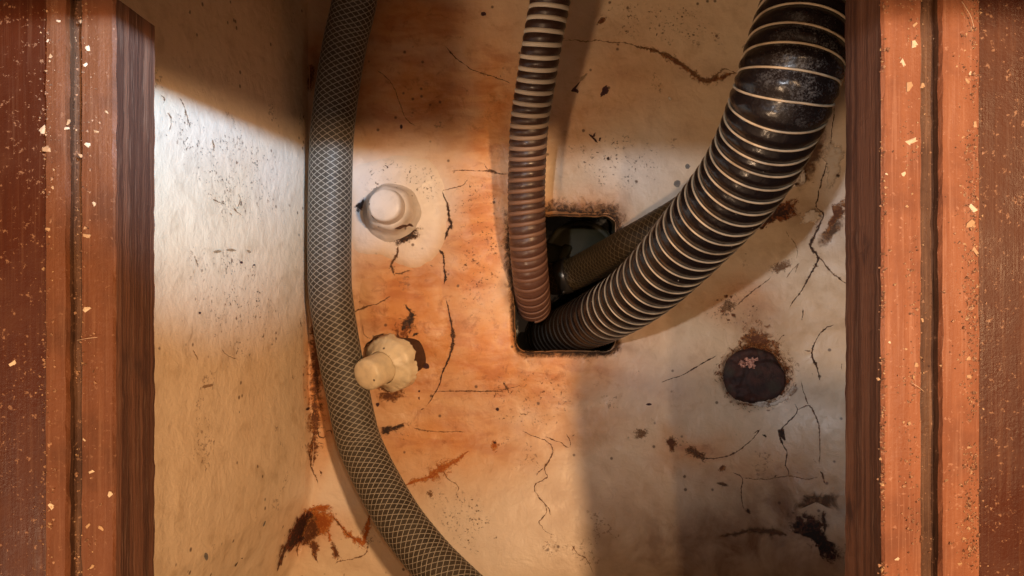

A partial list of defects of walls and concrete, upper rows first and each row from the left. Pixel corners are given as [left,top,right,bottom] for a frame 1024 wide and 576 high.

crack [566,39,735,86]
corrosion [390,228,420,274]
corrosion [364,305,418,348]
crack [421,166,518,410]
crack [688,114,845,514]
corrosion [376,381,404,407]
corrosion [715,321,796,412]
corrosion [277,504,371,571]
corrosion [406,451,468,497]
crack [525,432,593,572]
water stain [721,493,839,564]